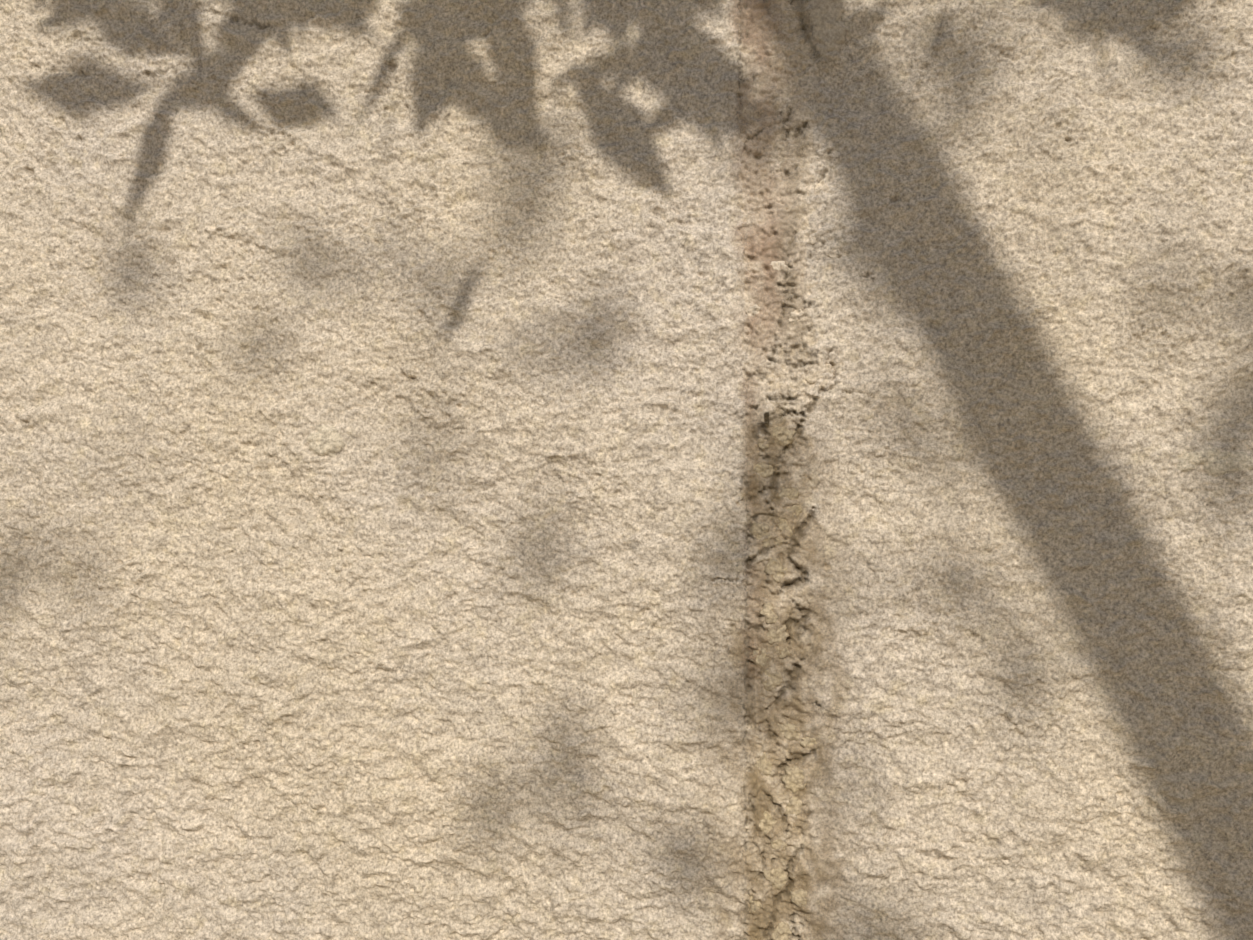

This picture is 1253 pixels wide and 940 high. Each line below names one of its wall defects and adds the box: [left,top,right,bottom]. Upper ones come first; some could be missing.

crack [745,387,847,489]
crack [724,525,813,768]